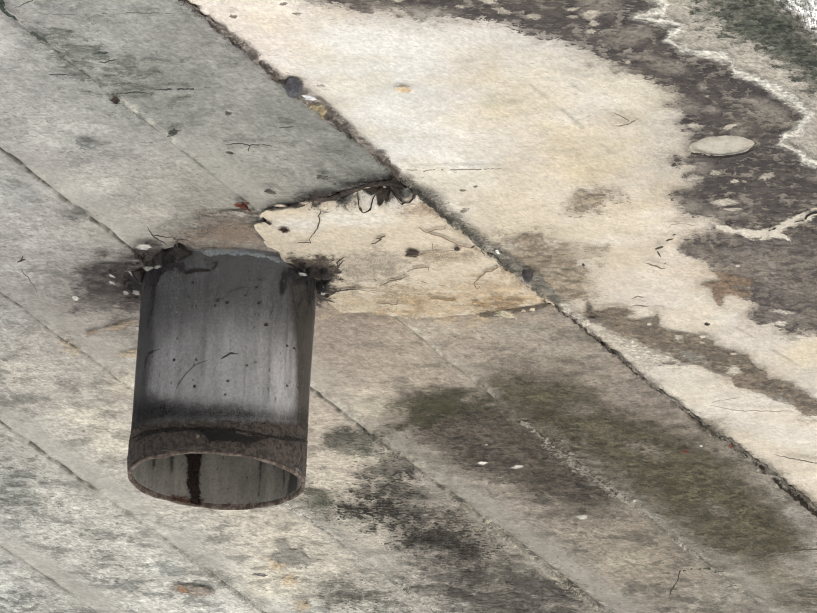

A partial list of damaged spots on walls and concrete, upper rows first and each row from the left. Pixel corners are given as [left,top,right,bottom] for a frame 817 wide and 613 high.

spalling [178,0,286,88]
damp [311,0,817,337]
damp [142,260,187,323]
damp [280,267,315,305]
spalling [254,80,817,520]
damp [498,227,817,416]
corrosion [127,420,308,477]
damp [271,378,769,613]